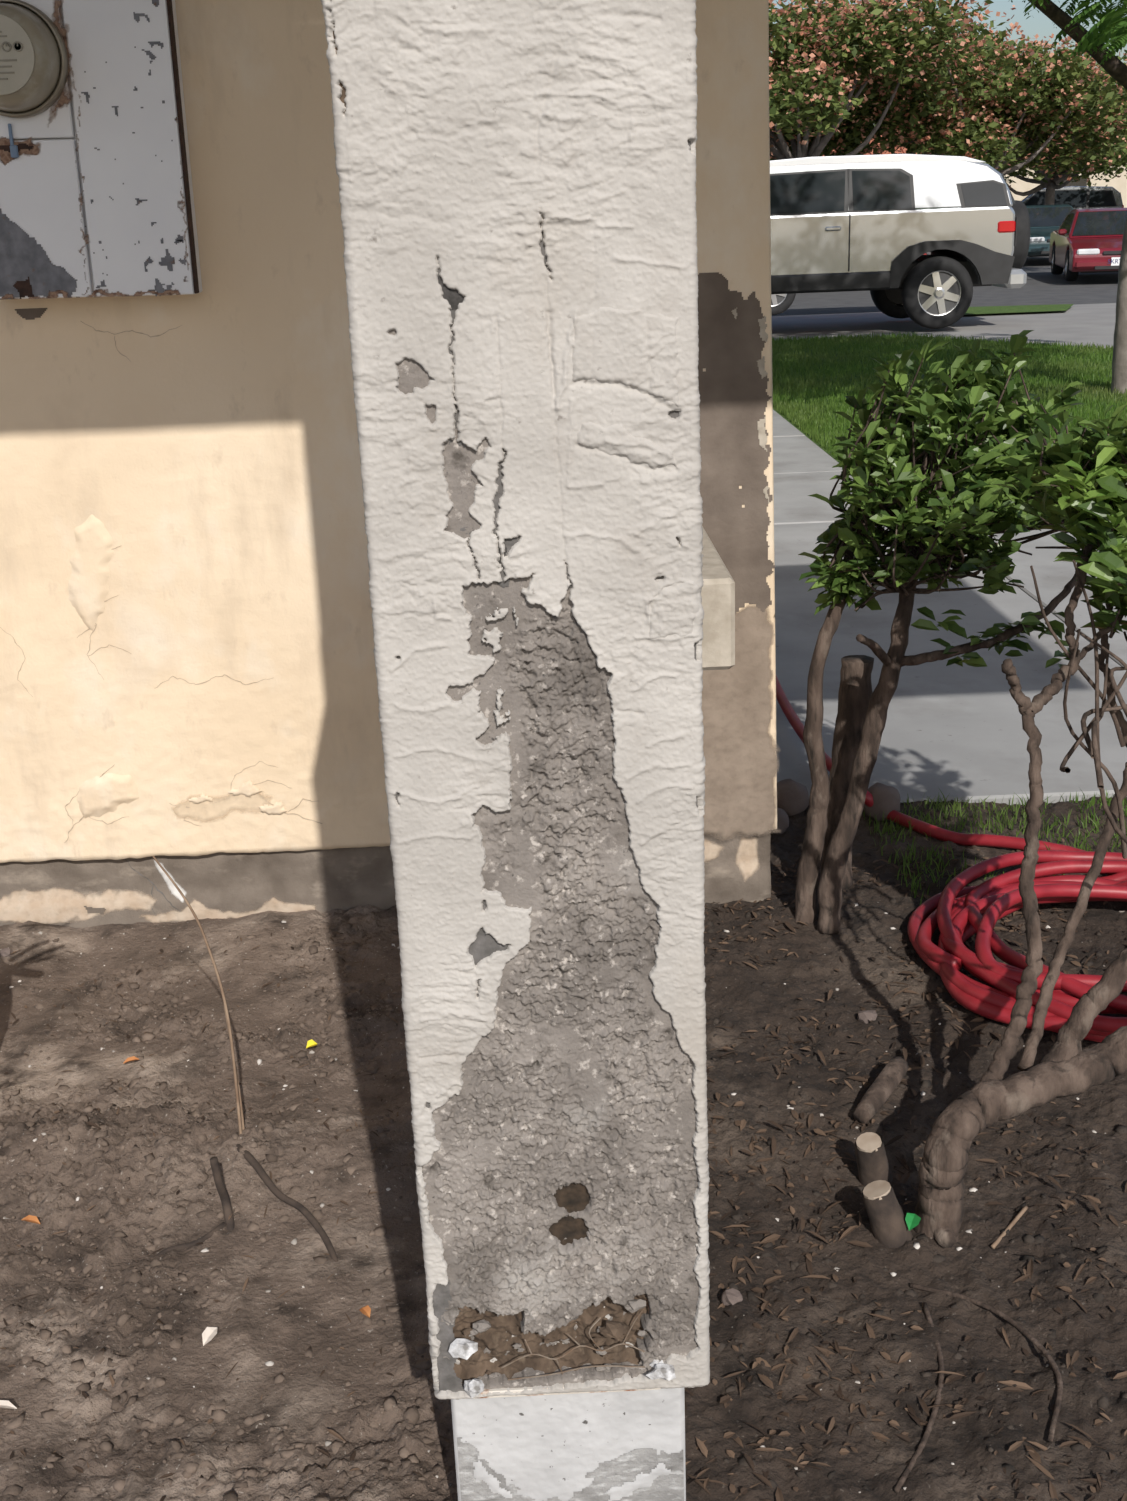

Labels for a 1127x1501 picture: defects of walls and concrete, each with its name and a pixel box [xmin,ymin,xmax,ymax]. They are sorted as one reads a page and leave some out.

crack [540,223,551,272]
peeling [397,358,436,424]
crack [437,257,465,446]
peeling [698,272,775,613]
peeling [442,429,491,545]
crack [460,449,520,588]
crack [77,595,131,678]
crack [154,674,272,689]
crack [171,761,323,826]
peeling [0,861,315,924]
spalling [422,575,700,1392]